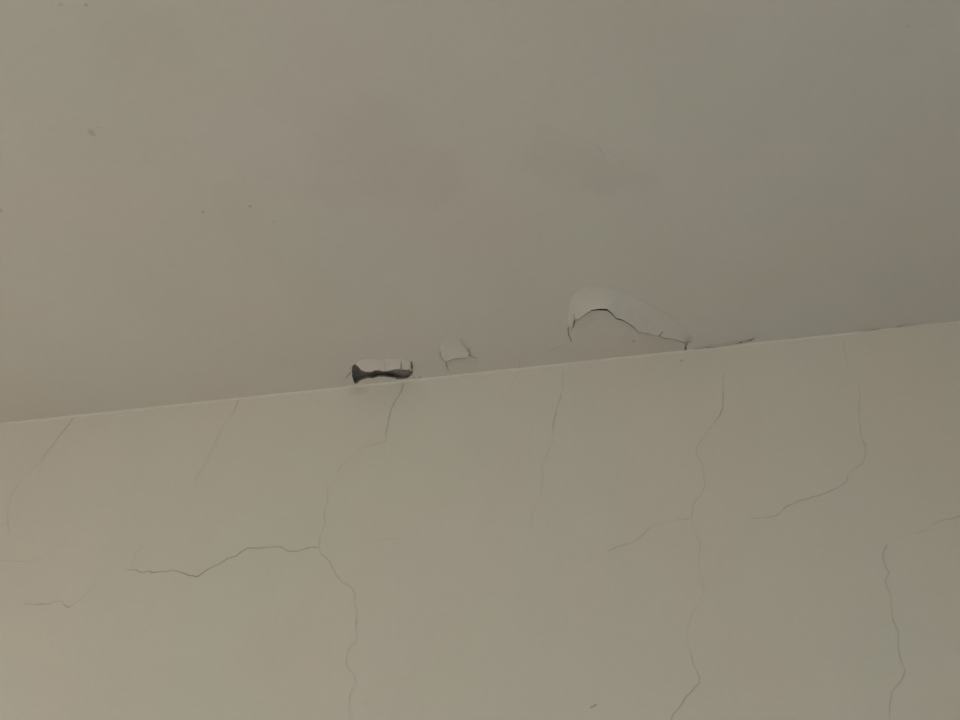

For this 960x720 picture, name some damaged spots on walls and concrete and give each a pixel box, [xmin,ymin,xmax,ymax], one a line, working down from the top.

spalling [344,359,416,383]
crack [125,383,405,720]